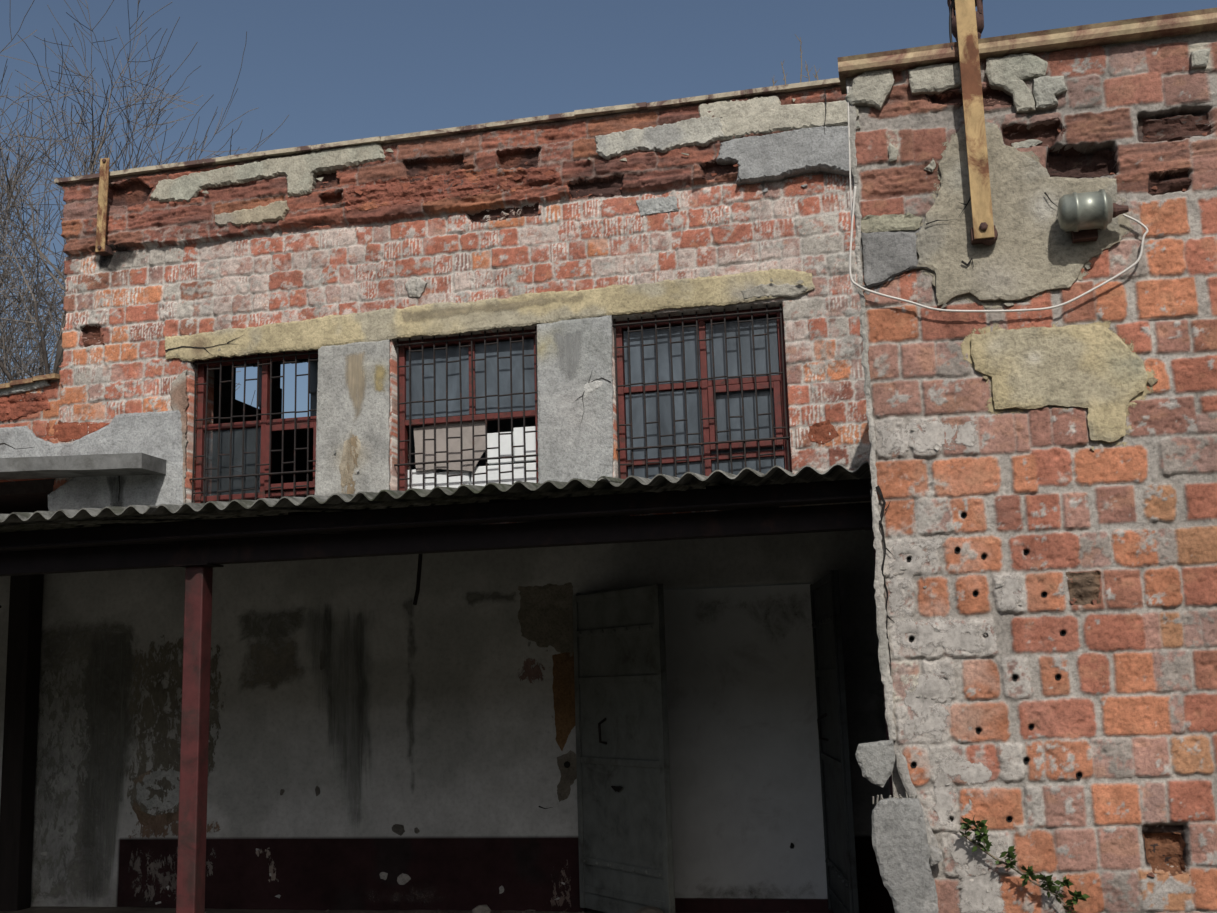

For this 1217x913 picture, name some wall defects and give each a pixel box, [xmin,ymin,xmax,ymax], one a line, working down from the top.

spalling [1142,113,1211,143]
spalling [315,147,627,211]
spalling [466,203,541,223]
spalling [700,158,739,180]
spalling [1148,168,1192,194]
crack [875,485,895,676]
flaking render [516,582,574,657]
leakage [241,607,365,786]
peeling [32,659,92,898]
peeling [126,635,184,904]
peeling [855,740,943,866]
spalling [1143,832,1191,877]